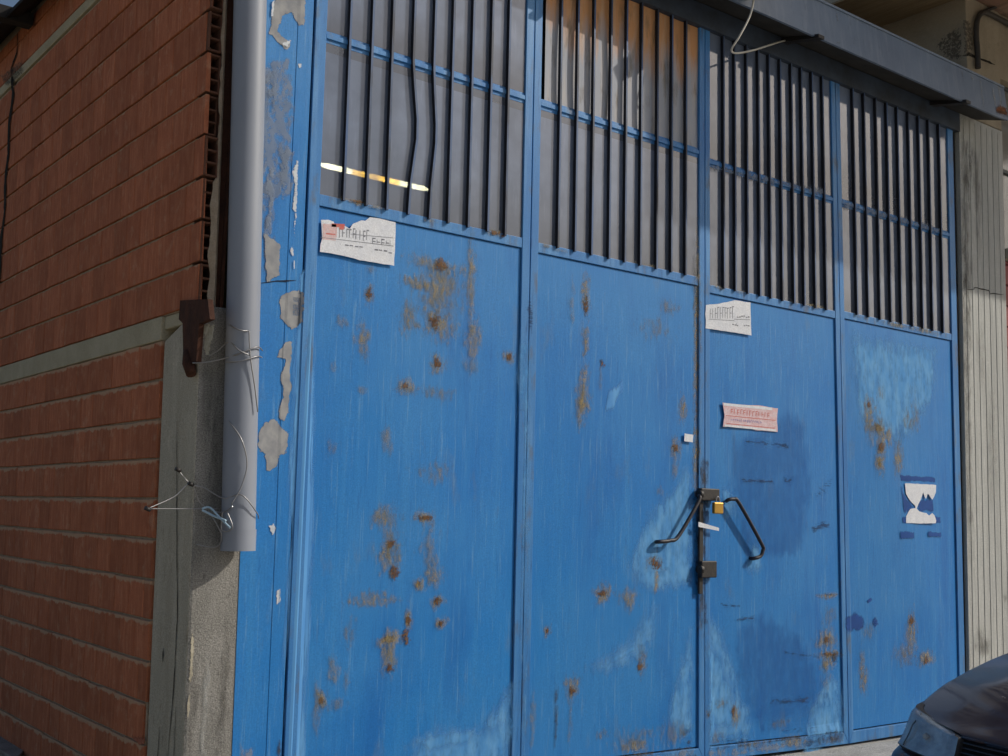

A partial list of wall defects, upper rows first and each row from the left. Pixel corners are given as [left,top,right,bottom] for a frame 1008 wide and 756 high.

crack [0,33,18,274]
peeling [263,0,306,282]
corrosion [405,257,455,304]
corrosion [404,307,446,337]
peeling [258,290,305,471]
corrosion [864,398,902,469]
corrosion [380,538,401,581]
corrosion [383,614,411,671]
corrosion [819,633,838,668]
corrosion [908,617,932,664]